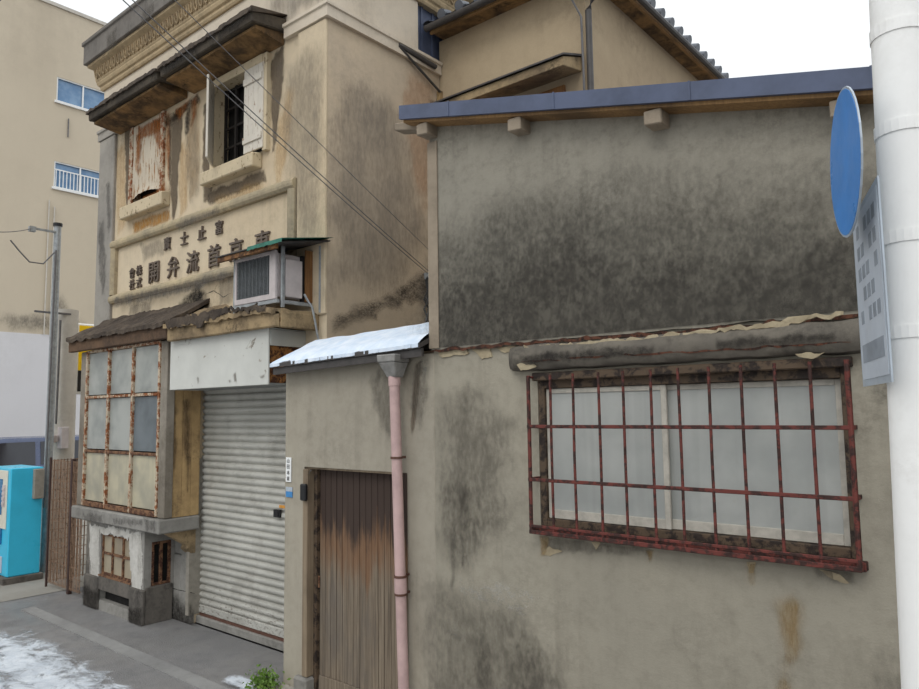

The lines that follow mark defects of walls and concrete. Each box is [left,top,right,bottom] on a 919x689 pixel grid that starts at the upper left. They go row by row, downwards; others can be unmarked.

rust [136,99,196,198]
water stain [439,214,857,347]
water stain [524,347,653,364]
peeling [89,524,143,589]